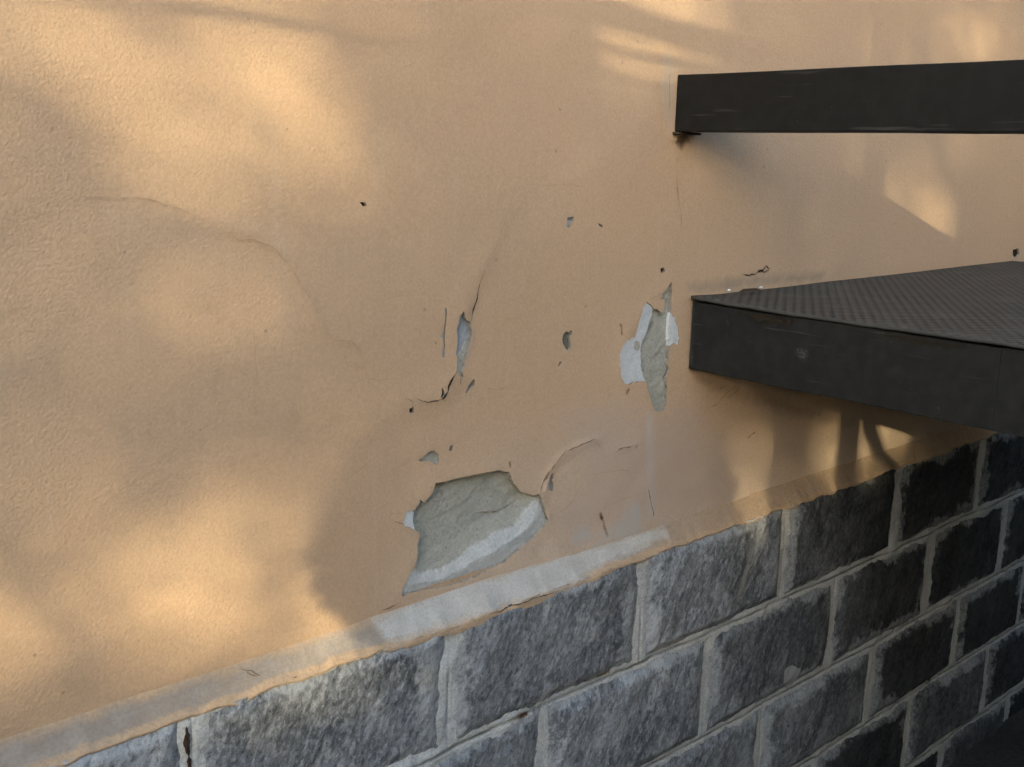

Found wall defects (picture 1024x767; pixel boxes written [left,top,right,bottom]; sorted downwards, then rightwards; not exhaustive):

crack [408,374,461,403]
spalling [441,315,474,388]
spalling [620,287,679,411]
crack [540,422,654,516]
peeling [365,470,677,652]